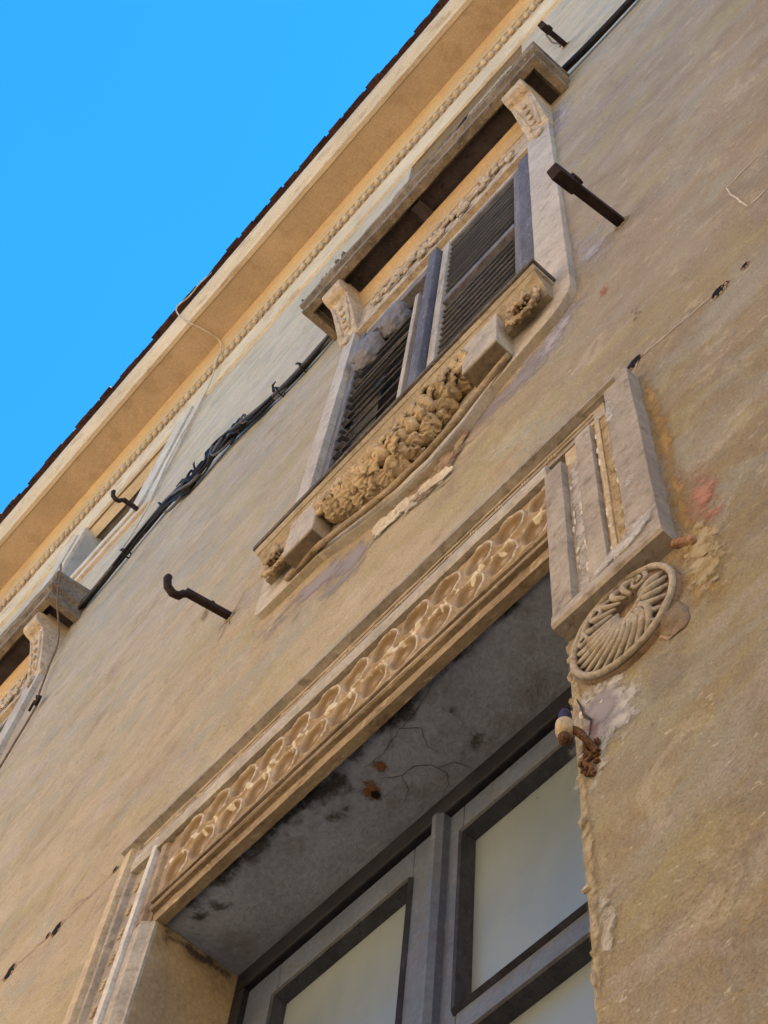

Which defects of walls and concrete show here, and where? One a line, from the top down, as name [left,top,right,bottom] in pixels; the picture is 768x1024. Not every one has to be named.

flaking render [372,429,476,540]
peeling [670,520,730,593]
water stain [209,772,351,886]
corrosion [363,761,387,800]
crack [365,683,472,802]
corrosion [578,737,601,777]
peeling [566,644,640,1013]